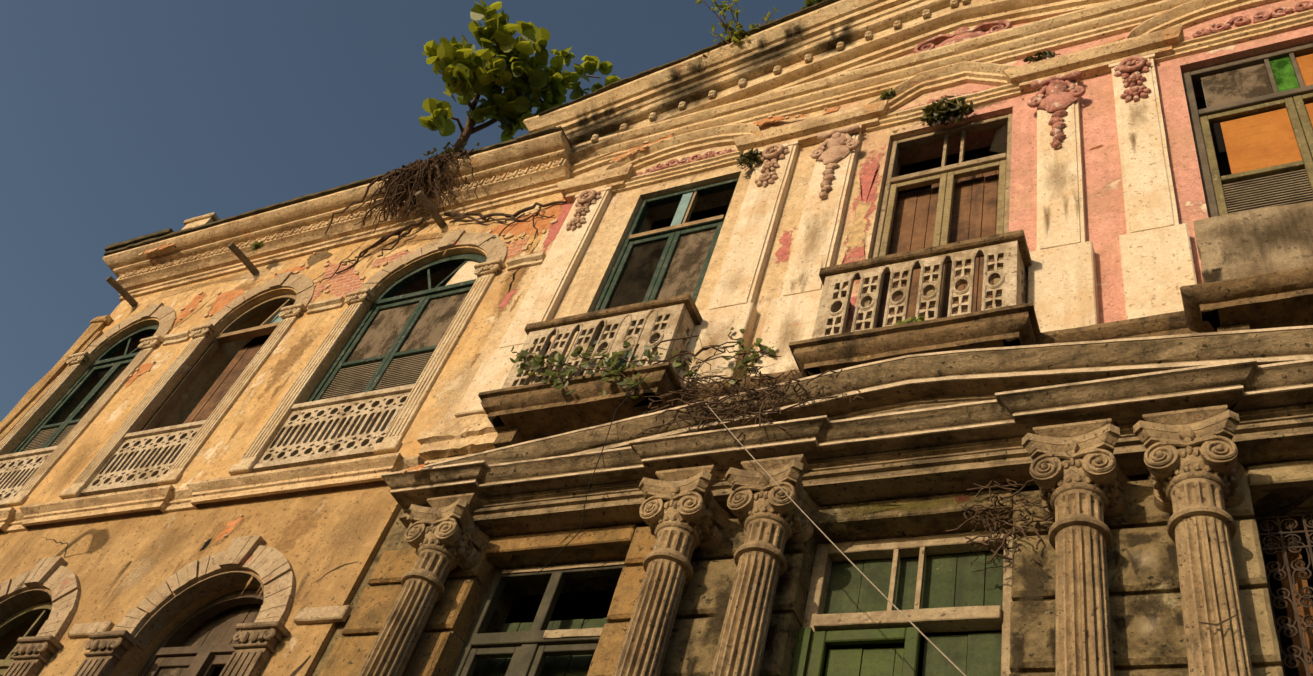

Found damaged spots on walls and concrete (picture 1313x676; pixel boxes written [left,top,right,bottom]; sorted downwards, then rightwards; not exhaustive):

flaking render [274,234,448,303]
flaking render [485,196,568,318]
water stain [1249,219,1309,249]
flaking render [170,279,257,331]
peeling [198,514,251,554]